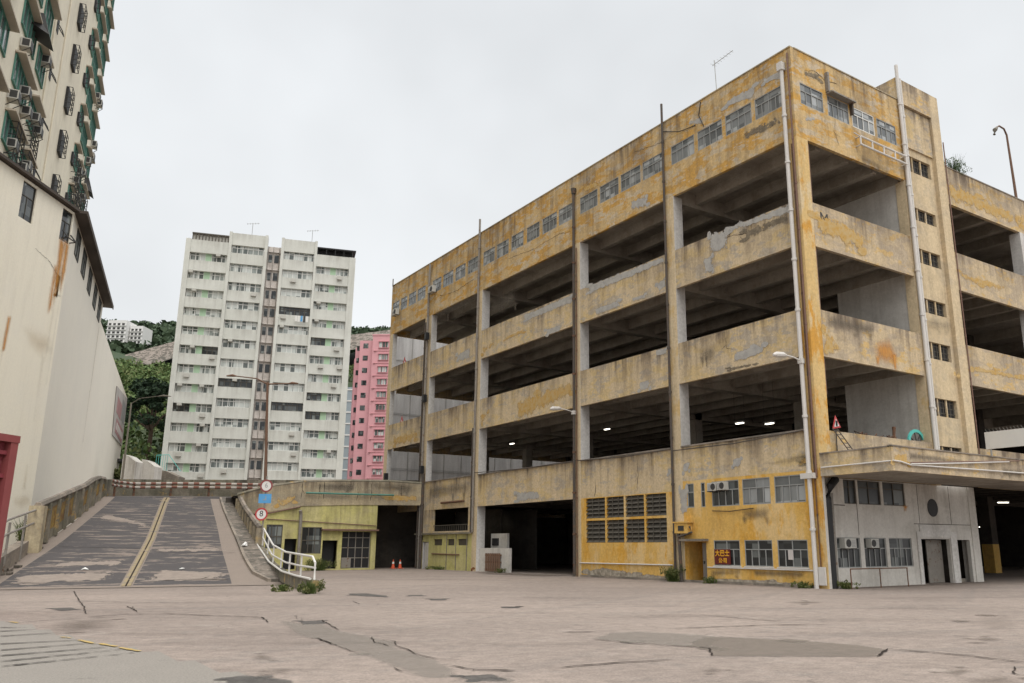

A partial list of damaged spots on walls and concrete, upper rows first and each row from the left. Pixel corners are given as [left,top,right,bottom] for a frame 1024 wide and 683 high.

peeling [721,72,780,111]
peeling [703,204,789,273]
rust [50,241,68,306]